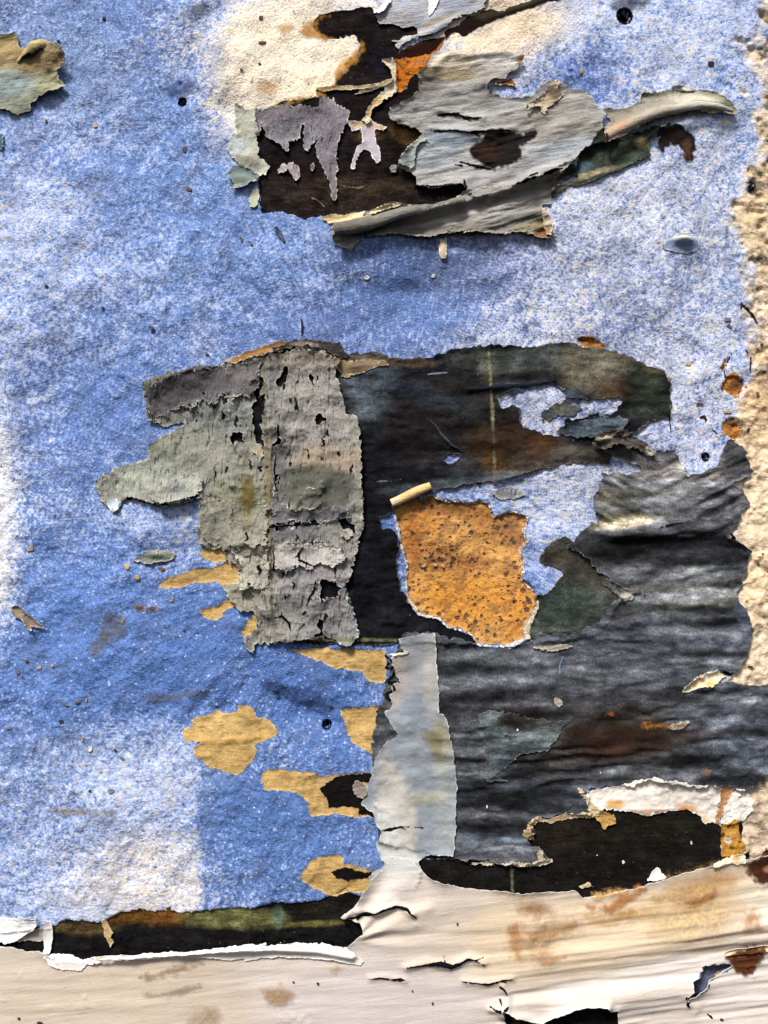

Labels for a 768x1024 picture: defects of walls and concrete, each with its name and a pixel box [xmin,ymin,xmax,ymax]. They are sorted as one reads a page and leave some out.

peeling [0,31,66,116]
spalling [395,37,445,92]
spalling [577,335,605,348]
spalling [720,361,747,398]
spalling [721,418,743,440]
spalling [394,495,536,648]
peeling [682,669,726,692]
peeling [668,721,690,730]
peeling [353,780,367,799]
peeling [586,777,754,857]
peeling [647,867,666,881]